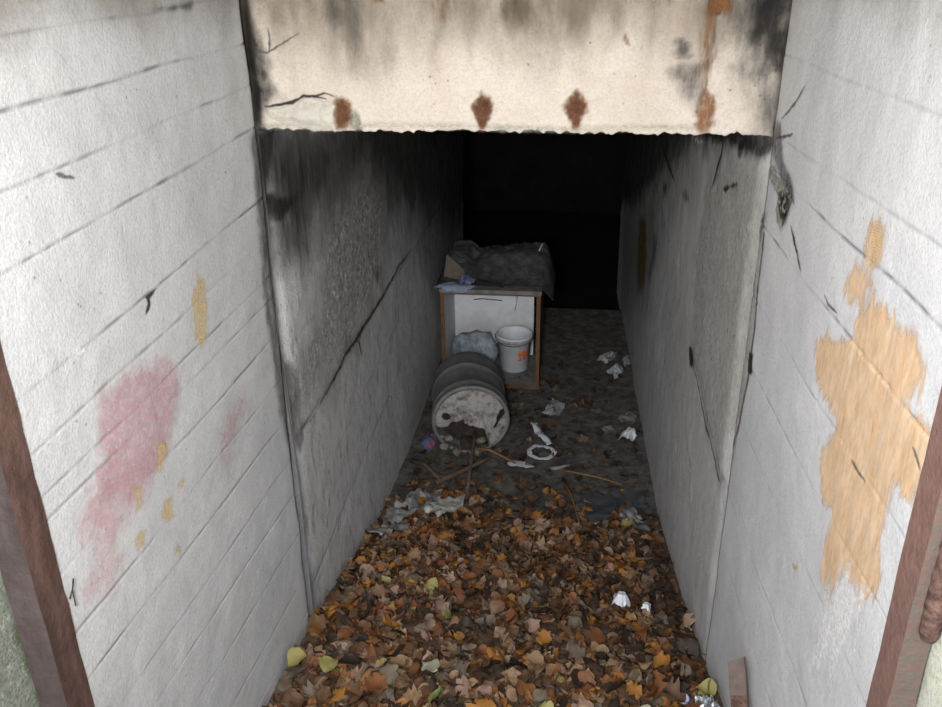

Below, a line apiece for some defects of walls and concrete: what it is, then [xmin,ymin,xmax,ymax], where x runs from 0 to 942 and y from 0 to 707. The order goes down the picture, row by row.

leakage [274,0,385,42]
leakage [507,0,579,33]
rust [696,0,730,132]
crack [265,92,329,107]
rust [334,99,351,128]
rust [472,95,492,129]
rust [564,91,587,129]
crack [310,249,411,421]
peeling [812,219,930,688]